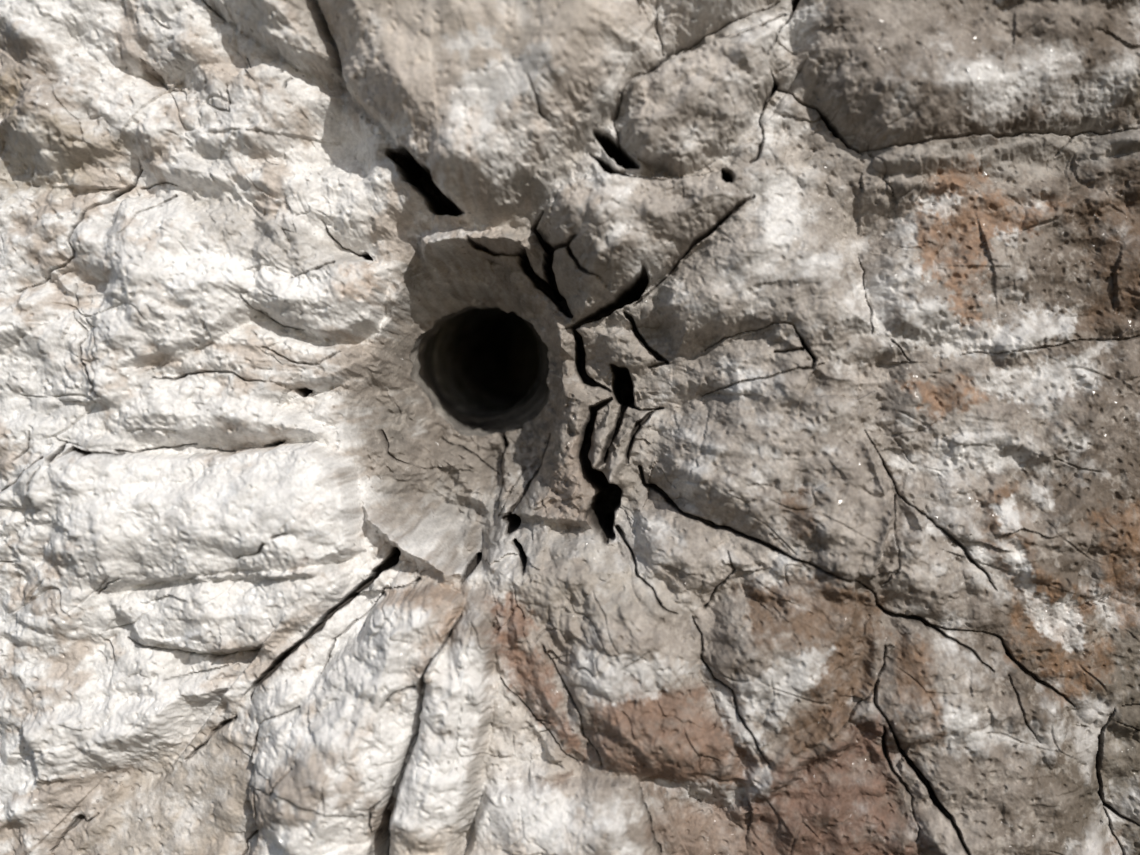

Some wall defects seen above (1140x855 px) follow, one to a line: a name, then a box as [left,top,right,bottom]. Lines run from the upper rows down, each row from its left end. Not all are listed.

crack [17,157,180,399]
crack [1,436,236,510]
crack [151,370,263,382]
crack [264,441,285,449]
crack [239,295,341,398]
crack [290,221,373,279]
crack [379,0,1140,769]
crack [51,814,99,853]
crack [128,547,422,855]
crack [368,615,462,855]
crack [829,645,971,855]
crack [1095,704,1140,855]